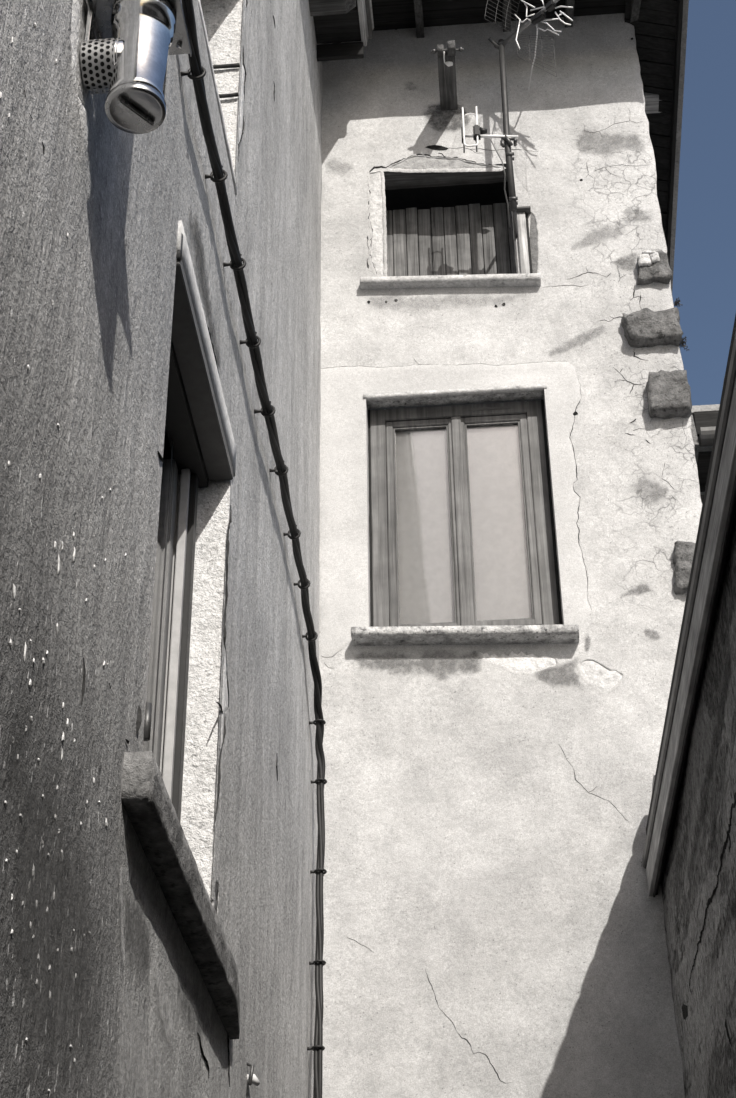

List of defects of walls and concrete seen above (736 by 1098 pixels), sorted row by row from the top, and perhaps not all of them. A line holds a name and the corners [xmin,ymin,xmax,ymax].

damp [428,105,469,131]
crack [570,392,589,602]
damp [356,651,477,676]
flaking render [576,658,626,695]
crack [560,746,628,821]
crack [689,792,736,992]
crack [425,969,511,1083]